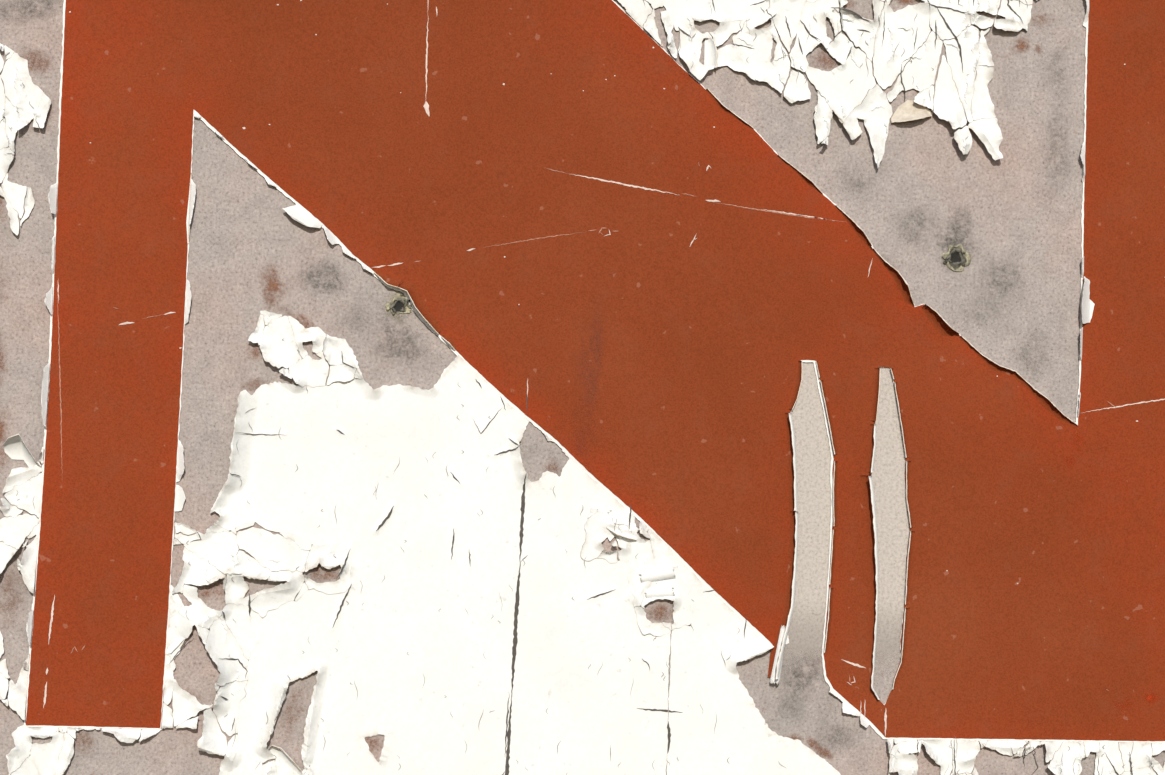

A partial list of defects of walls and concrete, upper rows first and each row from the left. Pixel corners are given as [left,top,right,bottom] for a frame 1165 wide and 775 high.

crack [750,0,820,54]
peeling [617,0,1037,168]
crack [831,7,885,60]
crack [900,0,975,102]
peeling [0,43,57,236]
peeling [44,236,55,314]
peeling [283,203,374,274]
peeling [0,310,841,775]
crack [474,380,528,775]
peeling [829,685,870,728]
peeling [887,737,1165,775]